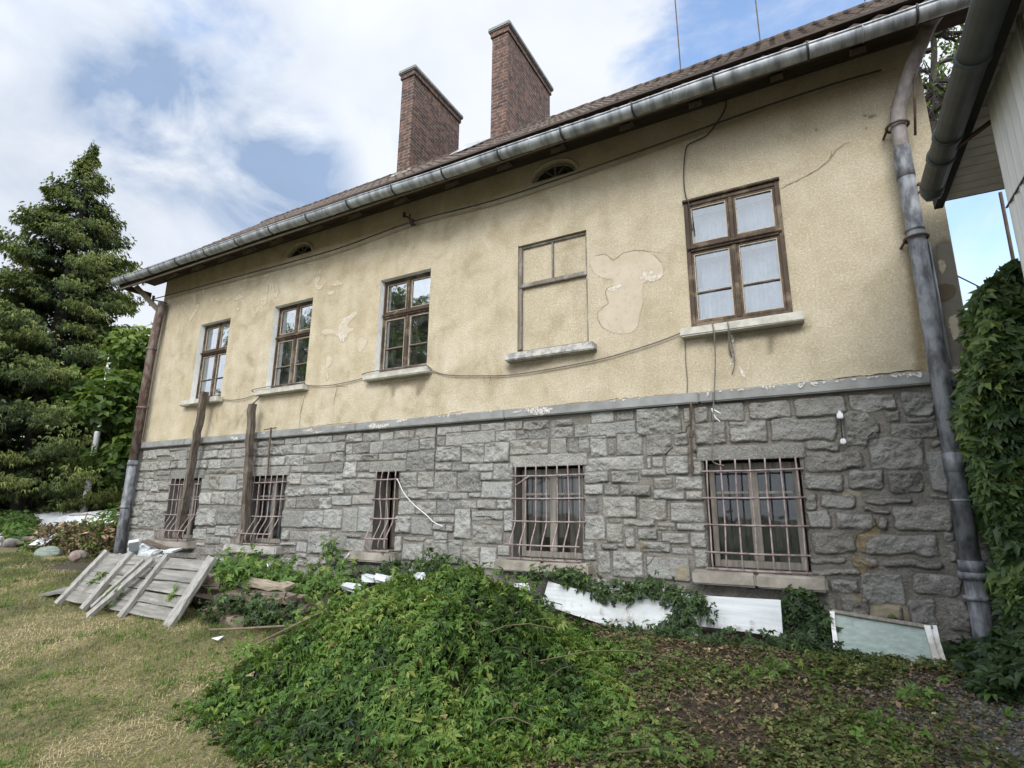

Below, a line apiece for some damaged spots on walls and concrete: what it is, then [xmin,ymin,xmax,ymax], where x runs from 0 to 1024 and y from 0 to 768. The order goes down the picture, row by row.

crack [780,143,849,189]
peeling [590,250,663,334]
peeling [707,334,922,396]